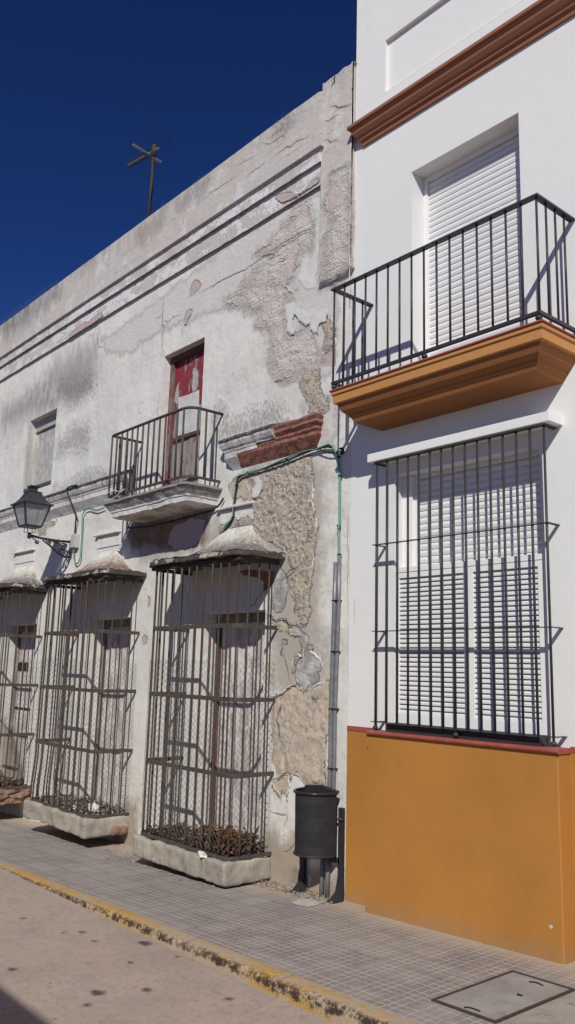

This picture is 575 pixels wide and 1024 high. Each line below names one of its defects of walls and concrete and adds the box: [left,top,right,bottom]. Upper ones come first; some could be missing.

crack [202,76,352,201]
peeling [101,163,355,450]
flaking render [218,454,330,802]